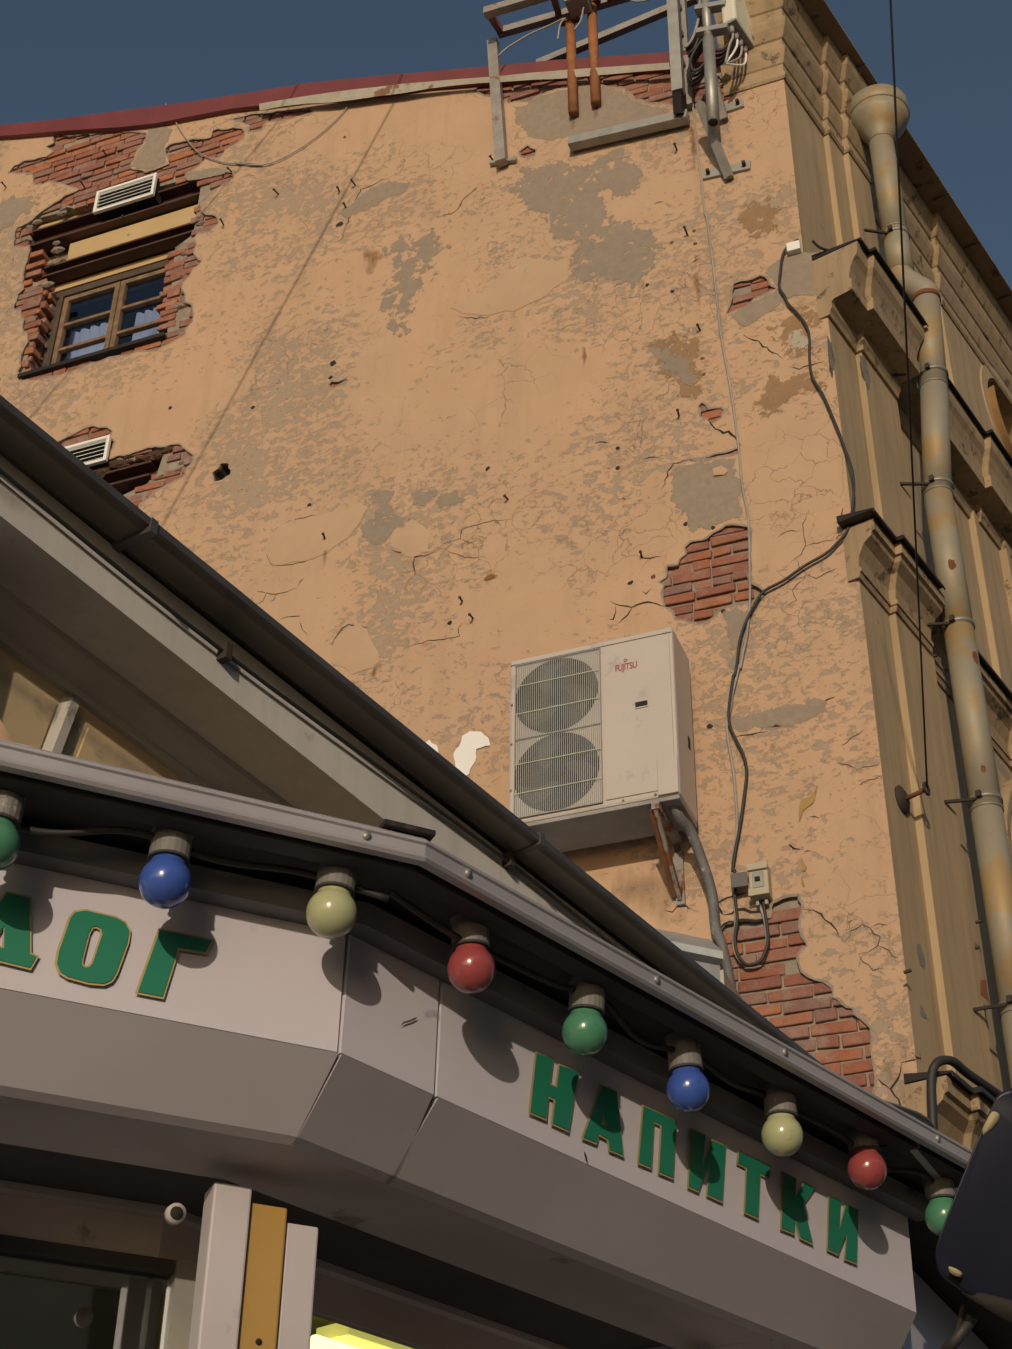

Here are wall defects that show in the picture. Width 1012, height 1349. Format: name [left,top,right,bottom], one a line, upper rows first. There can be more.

flaking render [518,145,537,158]
flaking render [8,107,313,381]
flaking render [725,275,777,315]
flaking render [57,425,194,508]
spalling [214,466,231,481]
flaking render [658,523,767,625]
flaking render [714,859,878,1094]
crack [879,1052,921,1106]